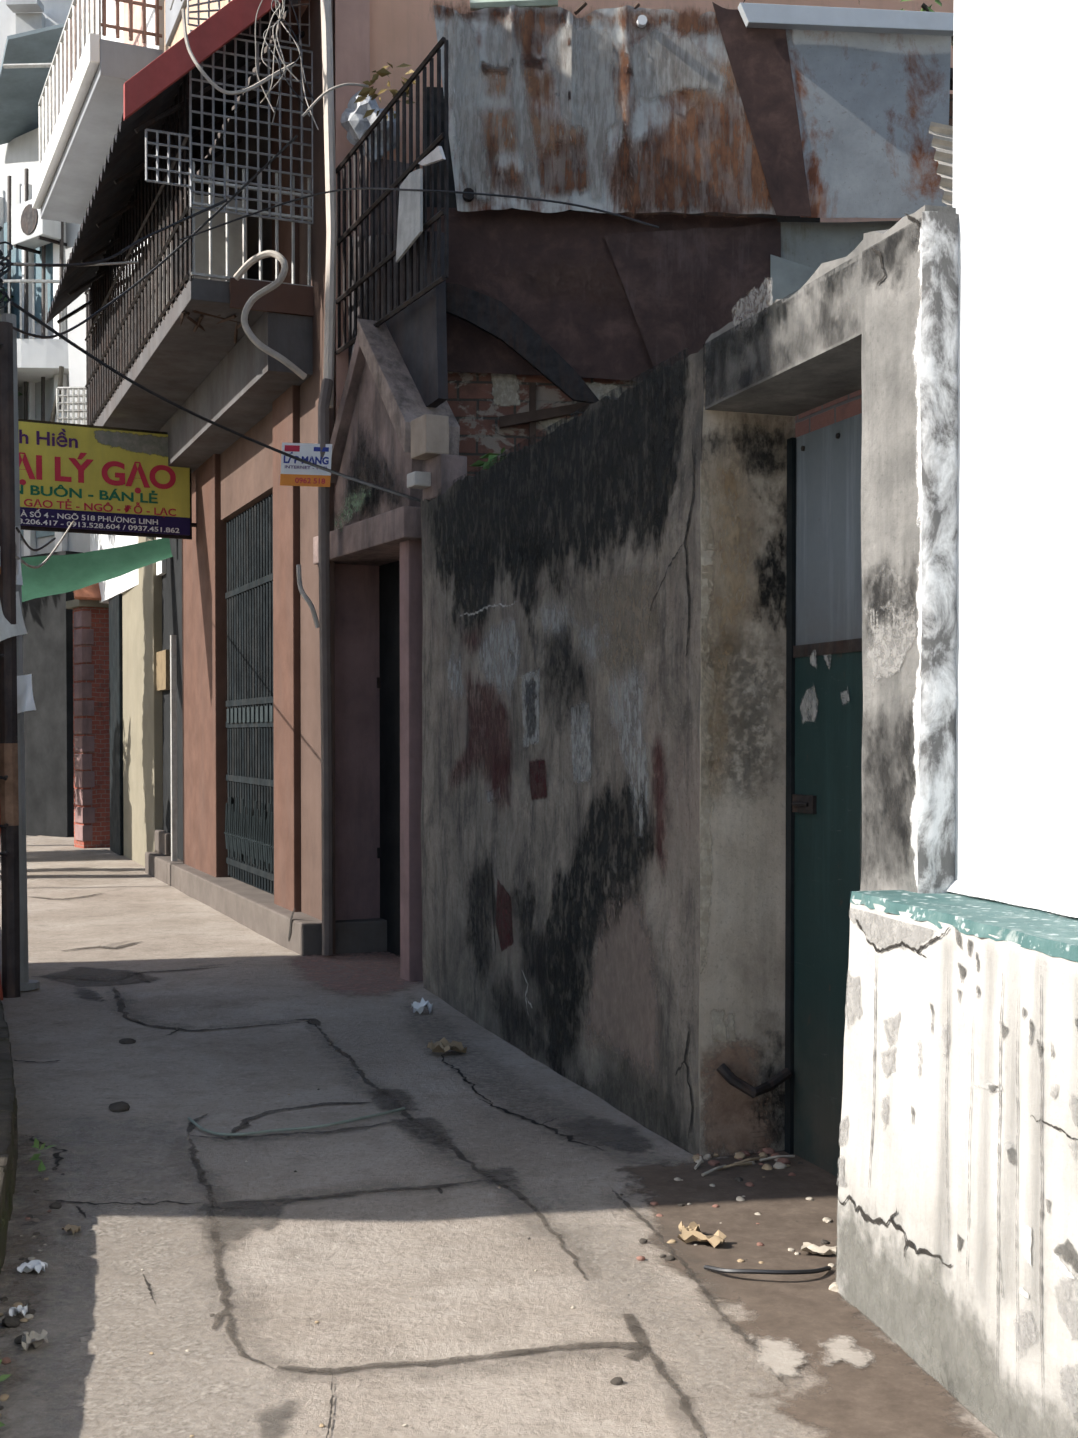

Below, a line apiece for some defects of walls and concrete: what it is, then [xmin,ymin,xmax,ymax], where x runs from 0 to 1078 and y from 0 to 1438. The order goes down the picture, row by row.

corrosion [433,1,776,217]
water stain [428,222,920,634]
crack [648,444,695,657]
water stain [467,777,685,1147]
peeling [845,974,862,1022]
peeling [955,929,980,998]
crack [26,942,706,1438]
crack [612,1191,786,1386]
peeling [837,1117,848,1186]
crack [836,919,1078,1413]
water stain [836,1215,1078,1438]
peeling [1054,1239,1078,1339]